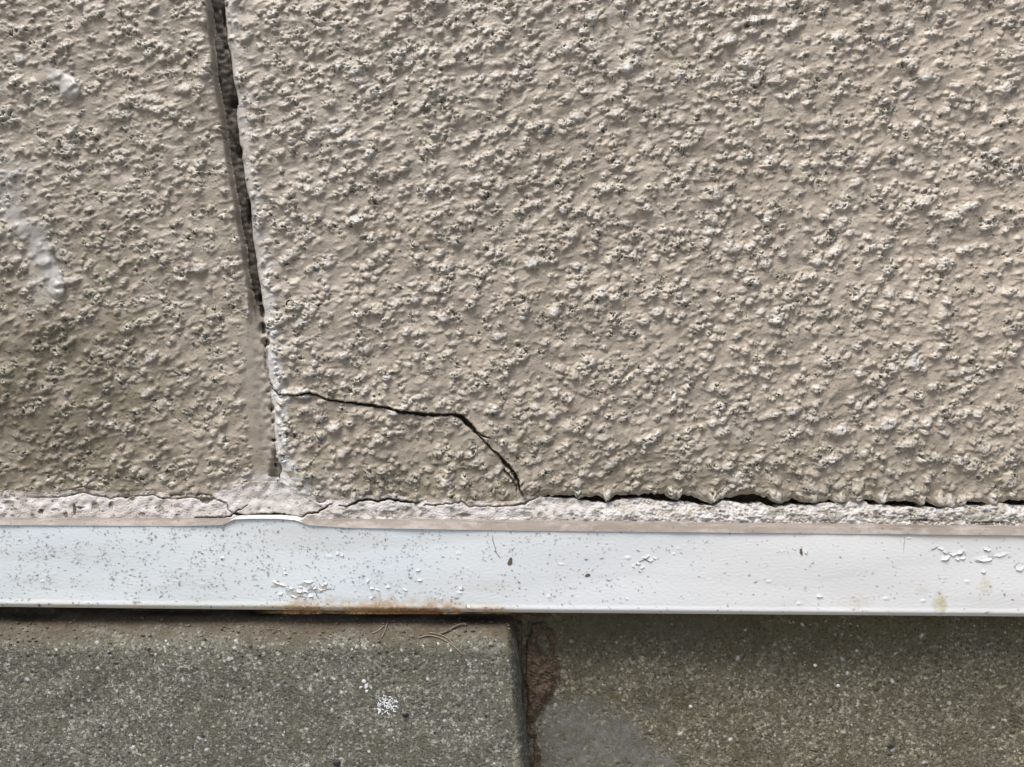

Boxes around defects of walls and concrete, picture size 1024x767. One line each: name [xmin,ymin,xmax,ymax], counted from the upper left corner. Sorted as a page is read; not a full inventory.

crack [28,386,539,518]
peeling [931,546,1006,574]